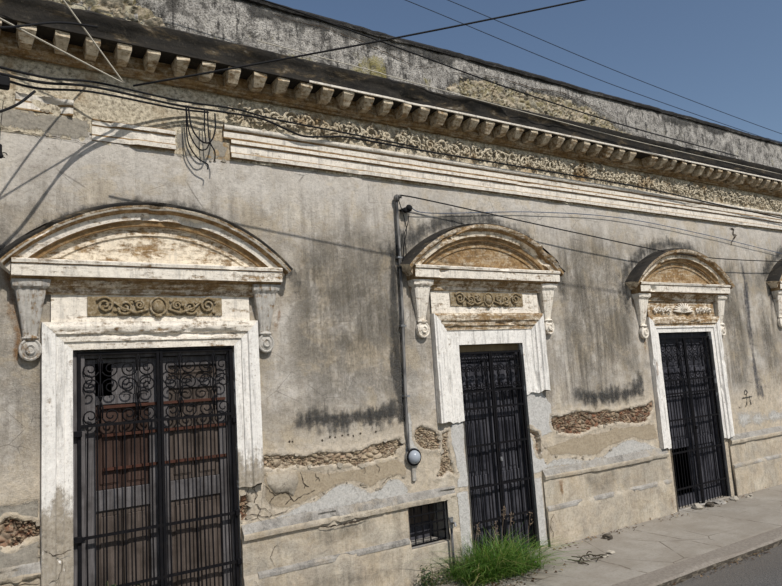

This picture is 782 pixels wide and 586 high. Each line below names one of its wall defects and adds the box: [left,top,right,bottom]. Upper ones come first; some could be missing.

damp [296,211,519,432]
damp [430,279,541,293]
damp [575,375,643,406]
peeling [0,488,74,586]
crack [244,472,320,521]
peeling [237,413,472,564]
spalling [527,392,657,546]